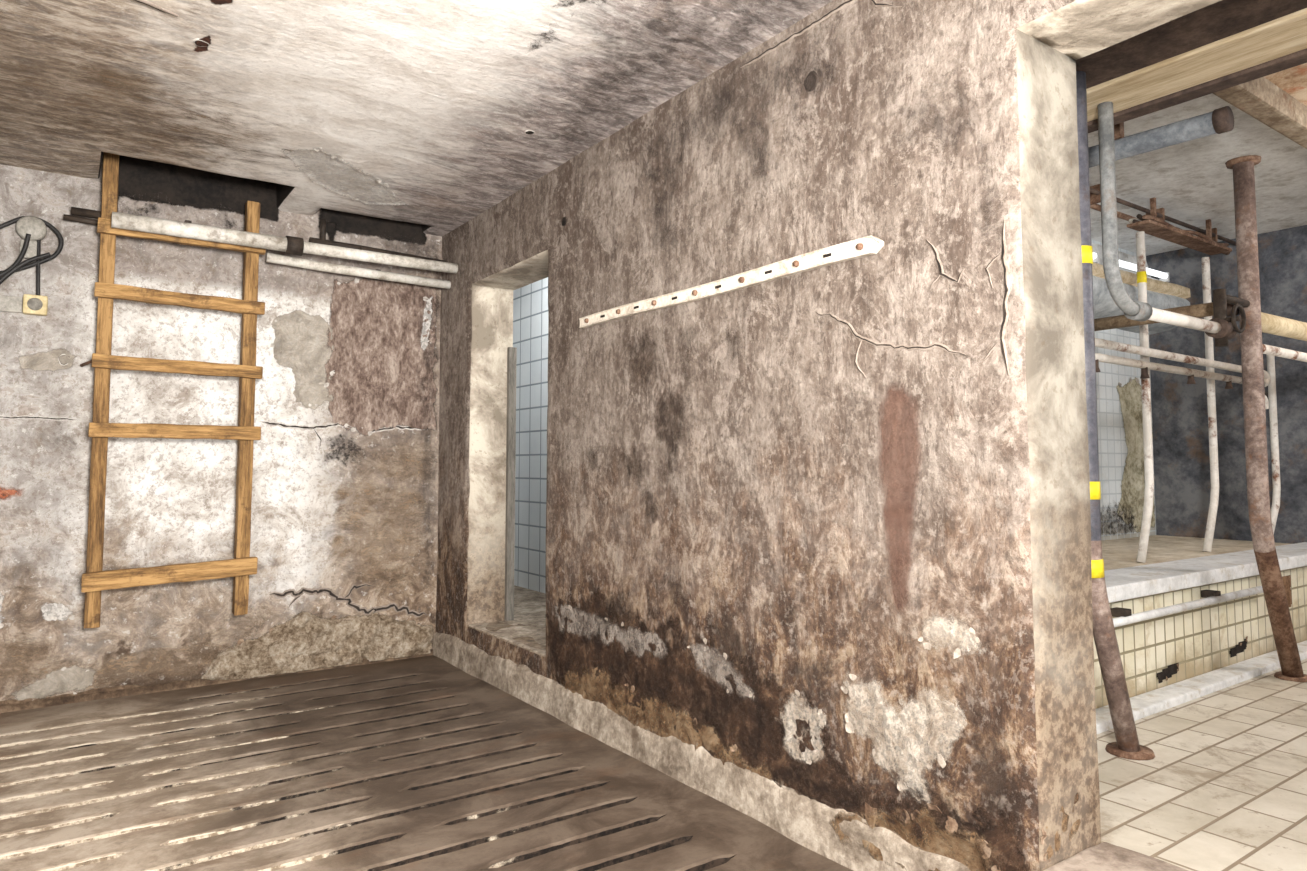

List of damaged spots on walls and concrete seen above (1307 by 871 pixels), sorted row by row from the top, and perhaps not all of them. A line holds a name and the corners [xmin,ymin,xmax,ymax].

water stain [586,1,707,104]
flaking render [270,278,438,436]
corrosion [0,487,21,500]
crack [269,583,427,617]
water stain [546,582,1028,871]